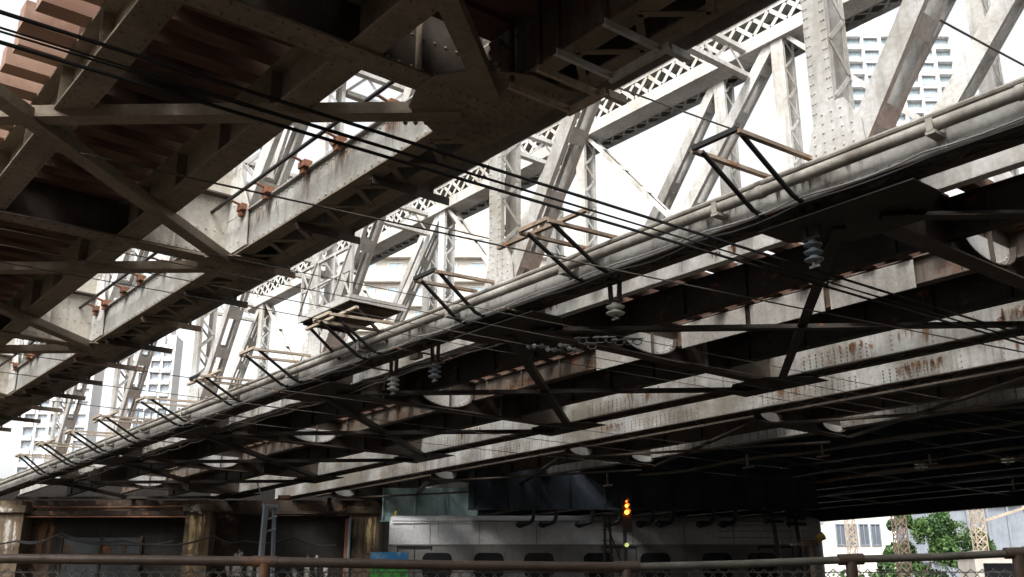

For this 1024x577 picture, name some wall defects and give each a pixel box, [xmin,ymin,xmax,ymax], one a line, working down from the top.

rust [997,305,1024,321]
rust [897,356,942,374]